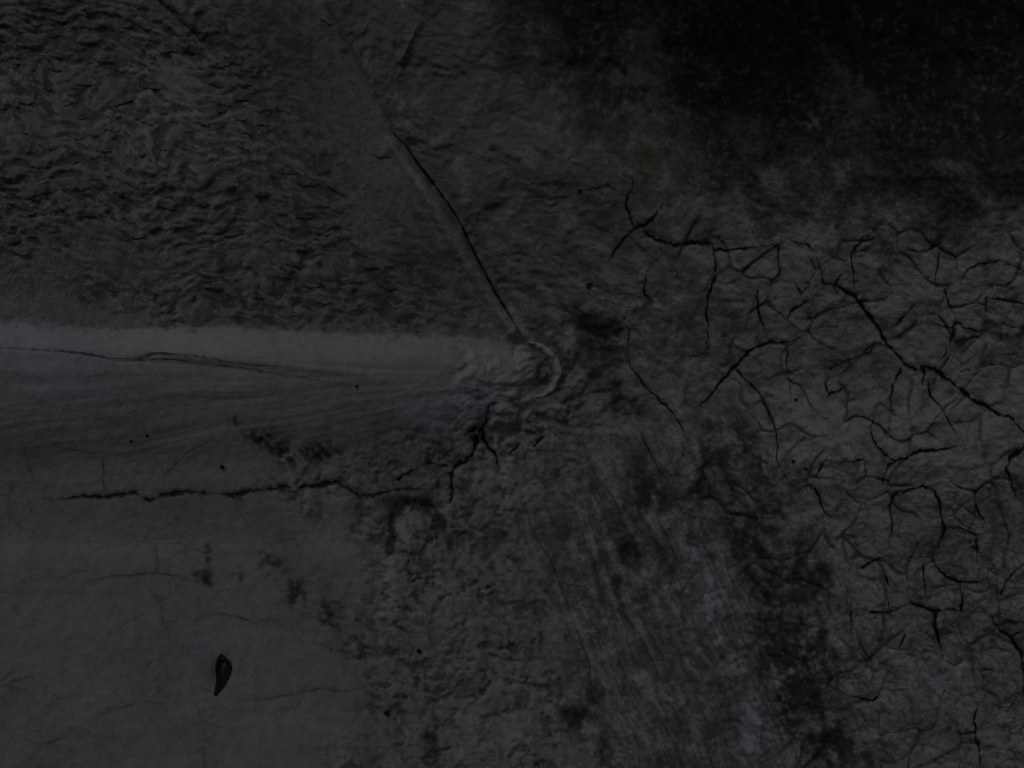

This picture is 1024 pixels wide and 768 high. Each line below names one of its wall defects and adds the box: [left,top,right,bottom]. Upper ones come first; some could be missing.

crack [393,133,525,340]
crack [5,347,352,386]
crack [26,401,545,506]
crack [587,172,1024,765]
spalling [213,654,232,696]